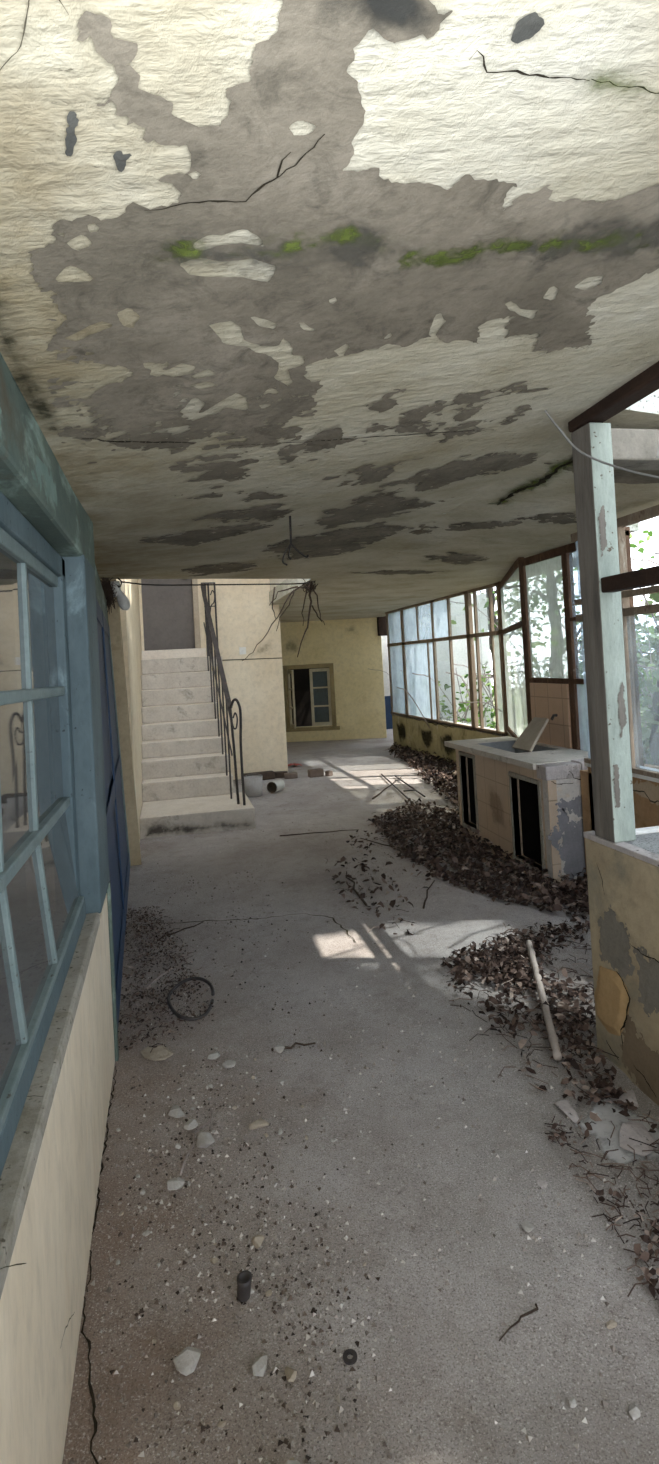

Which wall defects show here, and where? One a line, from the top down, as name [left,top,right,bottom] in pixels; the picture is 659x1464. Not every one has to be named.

crack [0,0,69,70]
damp [362,0,426,27]
crack [469,50,659,94]
crack [144,134,325,211]
damp [527,220,659,260]
spalling [28,0,659,576]
damp [2,336,57,431]
peeling [618,682,627,738]
peeling [548,795,586,881]
spalling [597,905,659,1106]
crack [60,1066,117,1464]